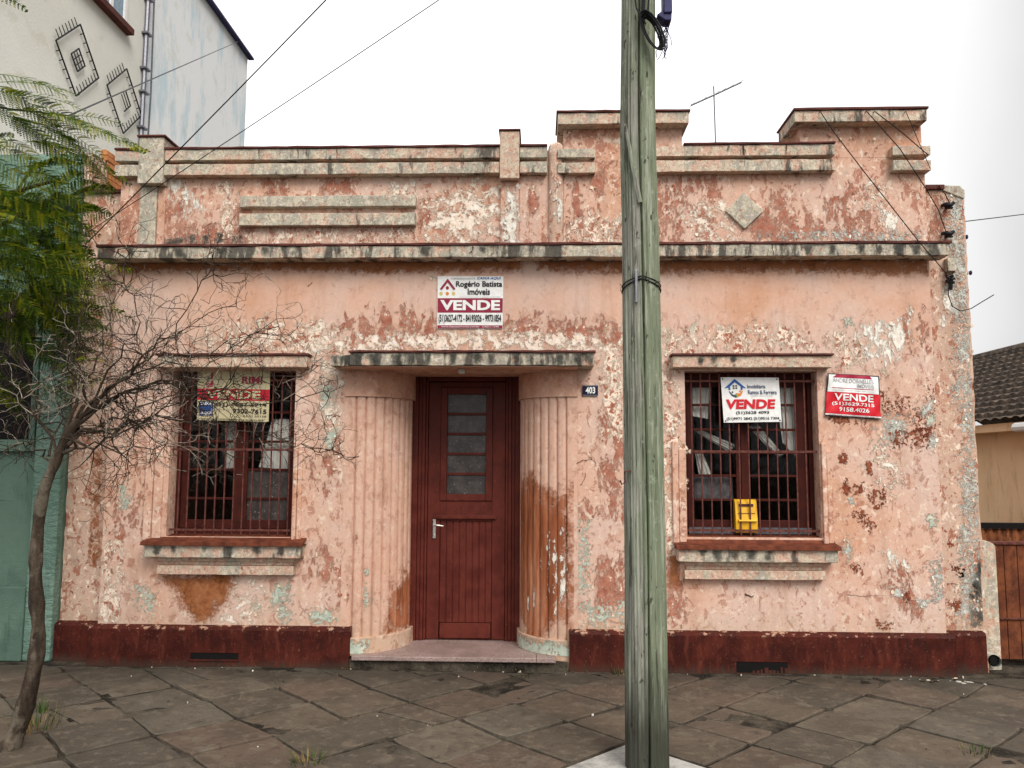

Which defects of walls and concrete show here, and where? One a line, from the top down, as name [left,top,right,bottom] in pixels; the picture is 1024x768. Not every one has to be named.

peeling [165,151,622,244]